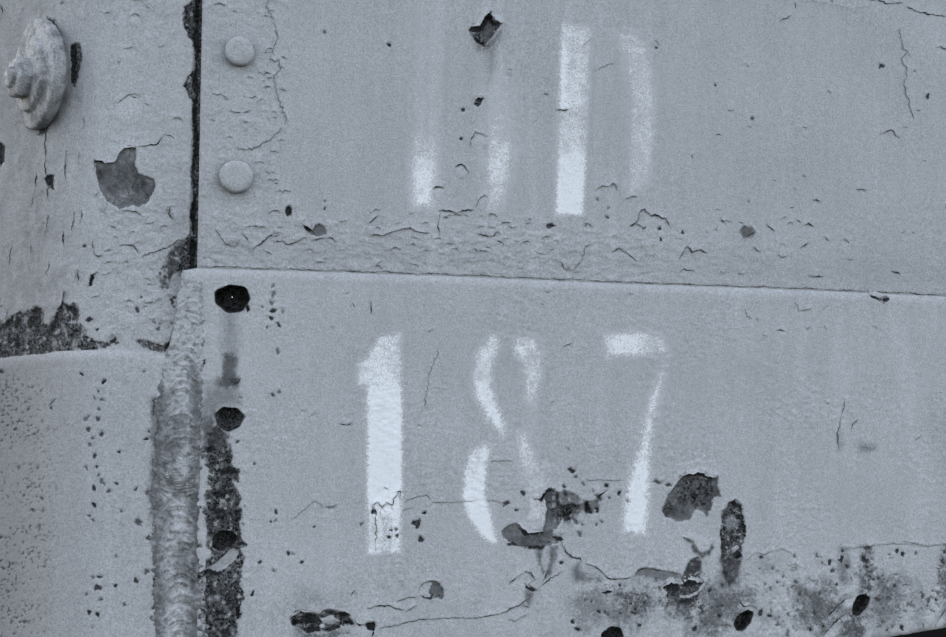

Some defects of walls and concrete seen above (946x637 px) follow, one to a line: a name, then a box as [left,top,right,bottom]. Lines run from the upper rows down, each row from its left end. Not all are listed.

peeling [465,9,504,47]
crack [882,32,914,138]
peeling [93,134,174,215]
crack [369,209,471,259]
crack [593,178,669,262]
peeling [501,482,621,549]
peeling [662,466,721,521]
spalling [198,542,247,578]
peeling [319,615,339,628]
crack [352,590,450,636]